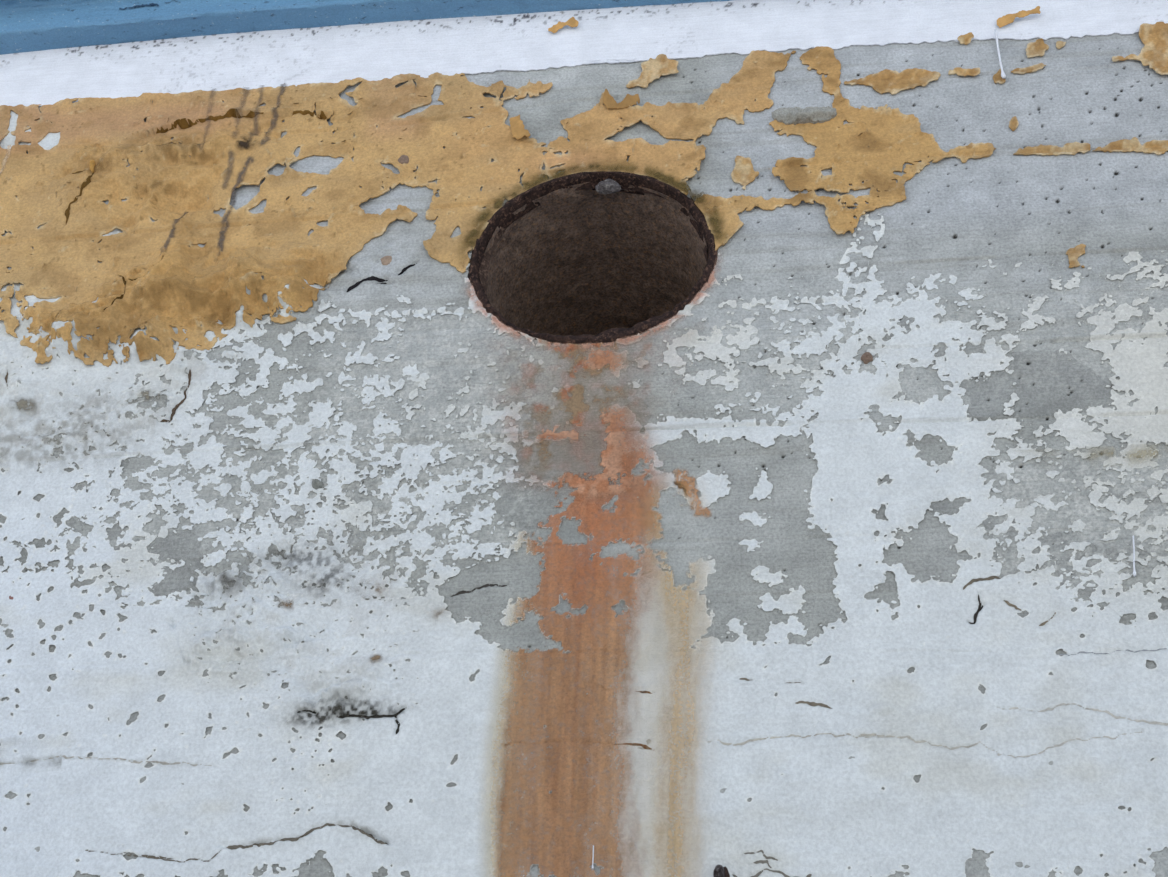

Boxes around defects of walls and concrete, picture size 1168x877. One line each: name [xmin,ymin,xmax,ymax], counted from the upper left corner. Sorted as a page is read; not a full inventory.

peeling [1112,22,1168,75]
crack [156,108,264,134]
crack [292,110,327,120]
peeling [1013,137,1168,156]
peeling [0,46,996,758]
peeling [864,244,1168,620]
corrosion [676,470,710,515]
corrosion [498,315,680,877]
water stain [297,700,391,724]
corrosion [665,572,694,877]
crack [0,755,212,766]
crack [85,823,387,862]